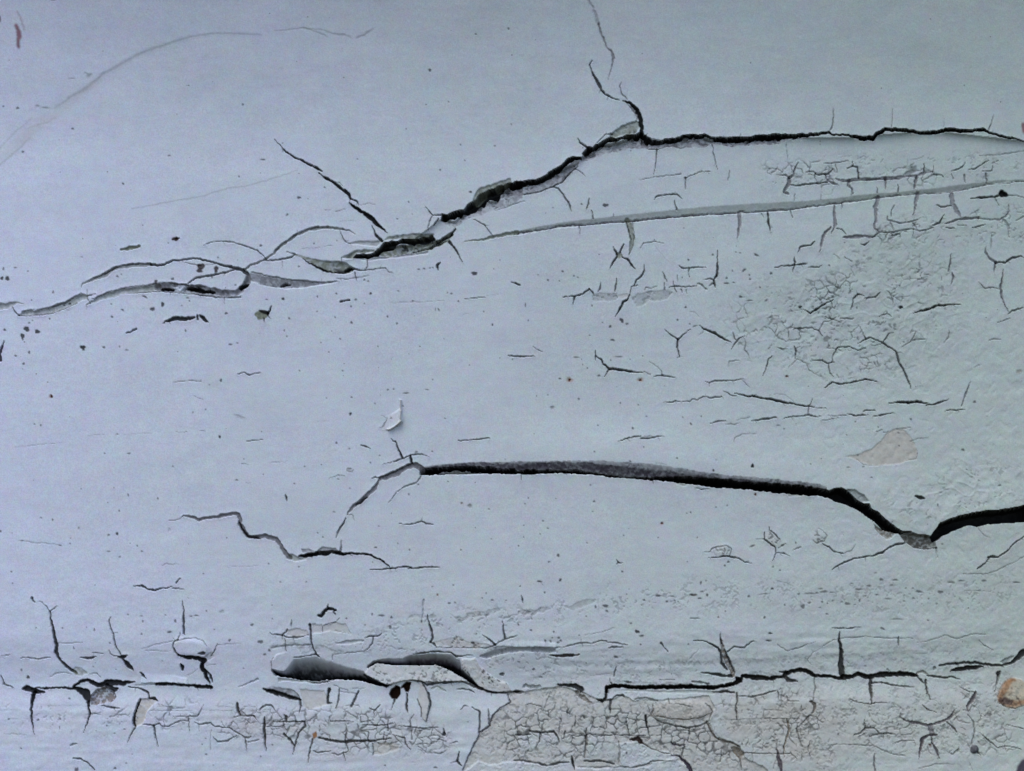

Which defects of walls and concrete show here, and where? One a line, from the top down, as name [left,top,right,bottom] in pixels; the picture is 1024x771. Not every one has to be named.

crack [0,0,1024,443]
peeling [378,399,403,431]
crack [168,435,1024,576]
peeling [842,427,930,467]
crack [132,577,186,636]
crack [0,596,491,771]
crack [420,599,518,650]
peeling [261,638,769,771]
crack [595,626,1024,771]
corrosion [997,677,1024,710]